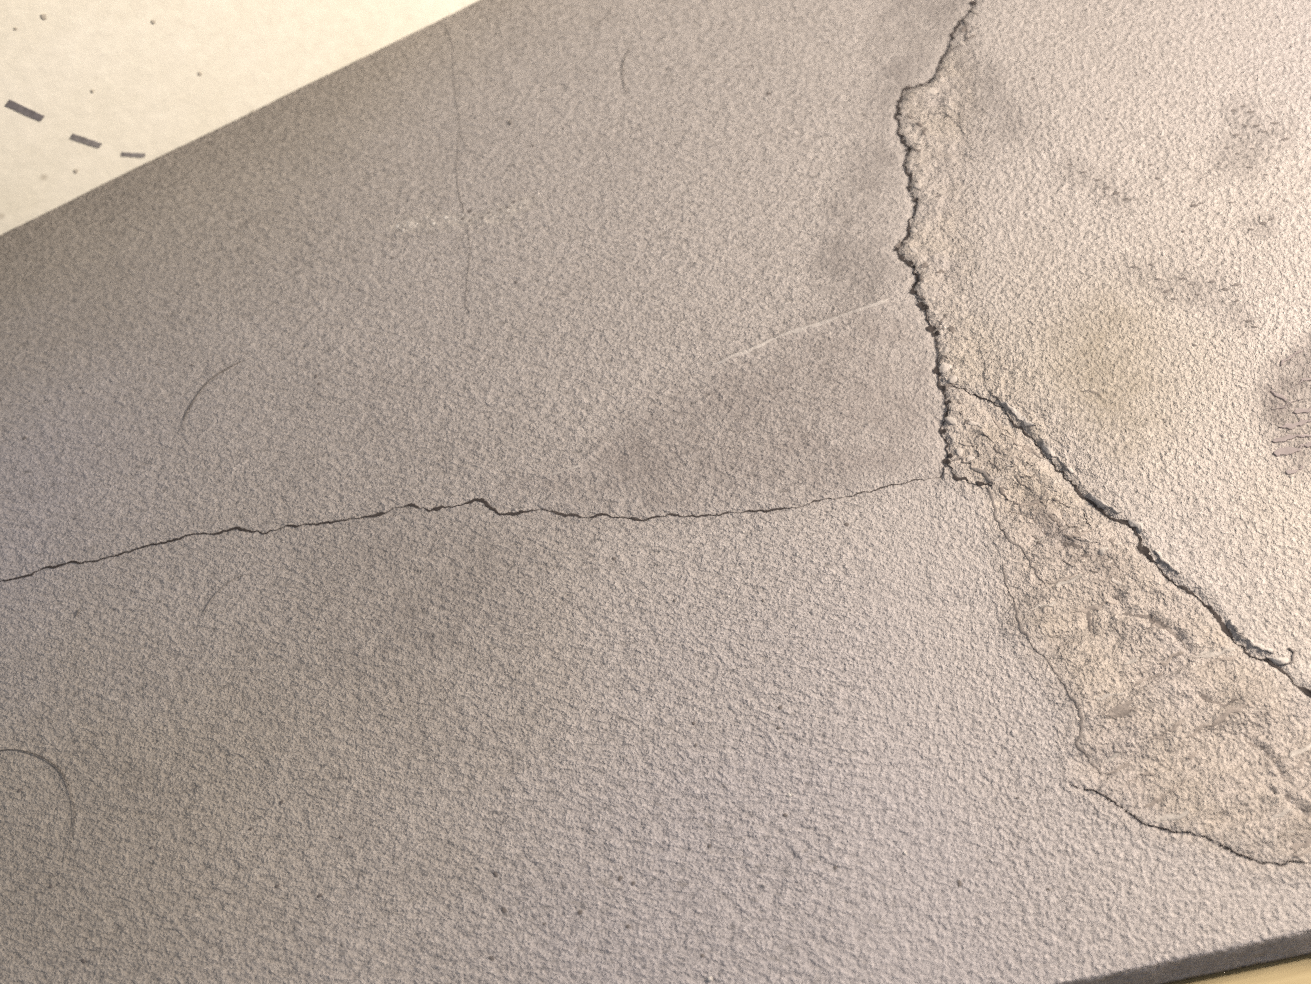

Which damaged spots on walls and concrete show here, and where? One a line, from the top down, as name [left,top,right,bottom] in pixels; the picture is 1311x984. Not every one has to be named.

crack [0,0,1311,697]
spalling [895,10,1311,887]
crack [1003,564,1311,866]
leakage [1269,377,1311,475]